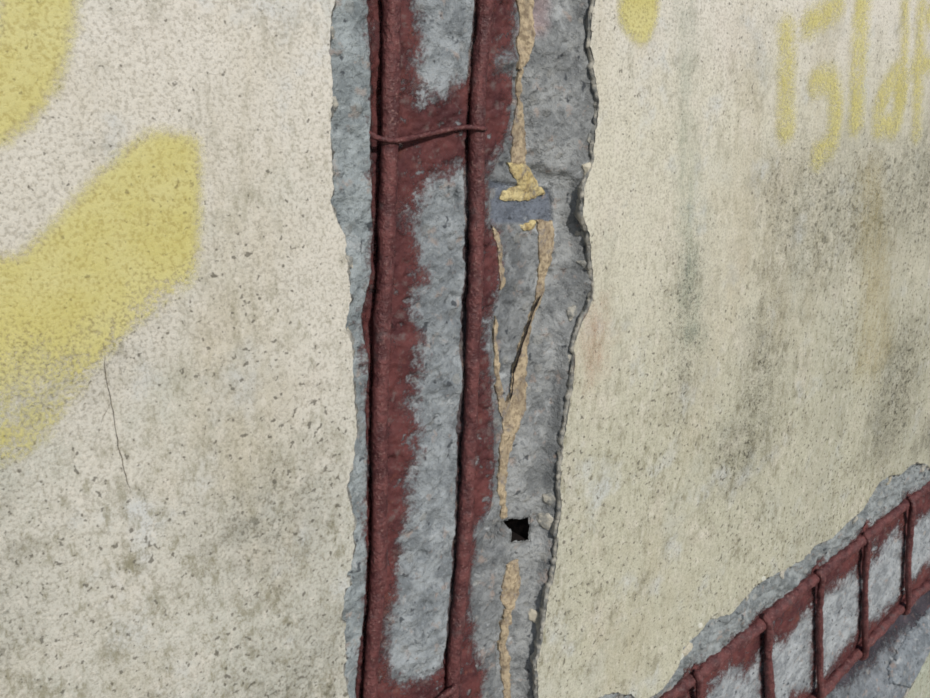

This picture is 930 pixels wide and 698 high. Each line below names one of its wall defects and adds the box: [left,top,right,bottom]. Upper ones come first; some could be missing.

spalling [329,0,382,698]
corrosion [353,0,383,698]
spalling [377,95,470,694]
corrosion [377,0,472,698]
spalling [400,0,477,111]
corrosion [458,0,518,698]
crack [509,294,542,404]
spalling [460,0,599,698]
spalling [650,462,930,698]
corrosion [678,491,930,698]